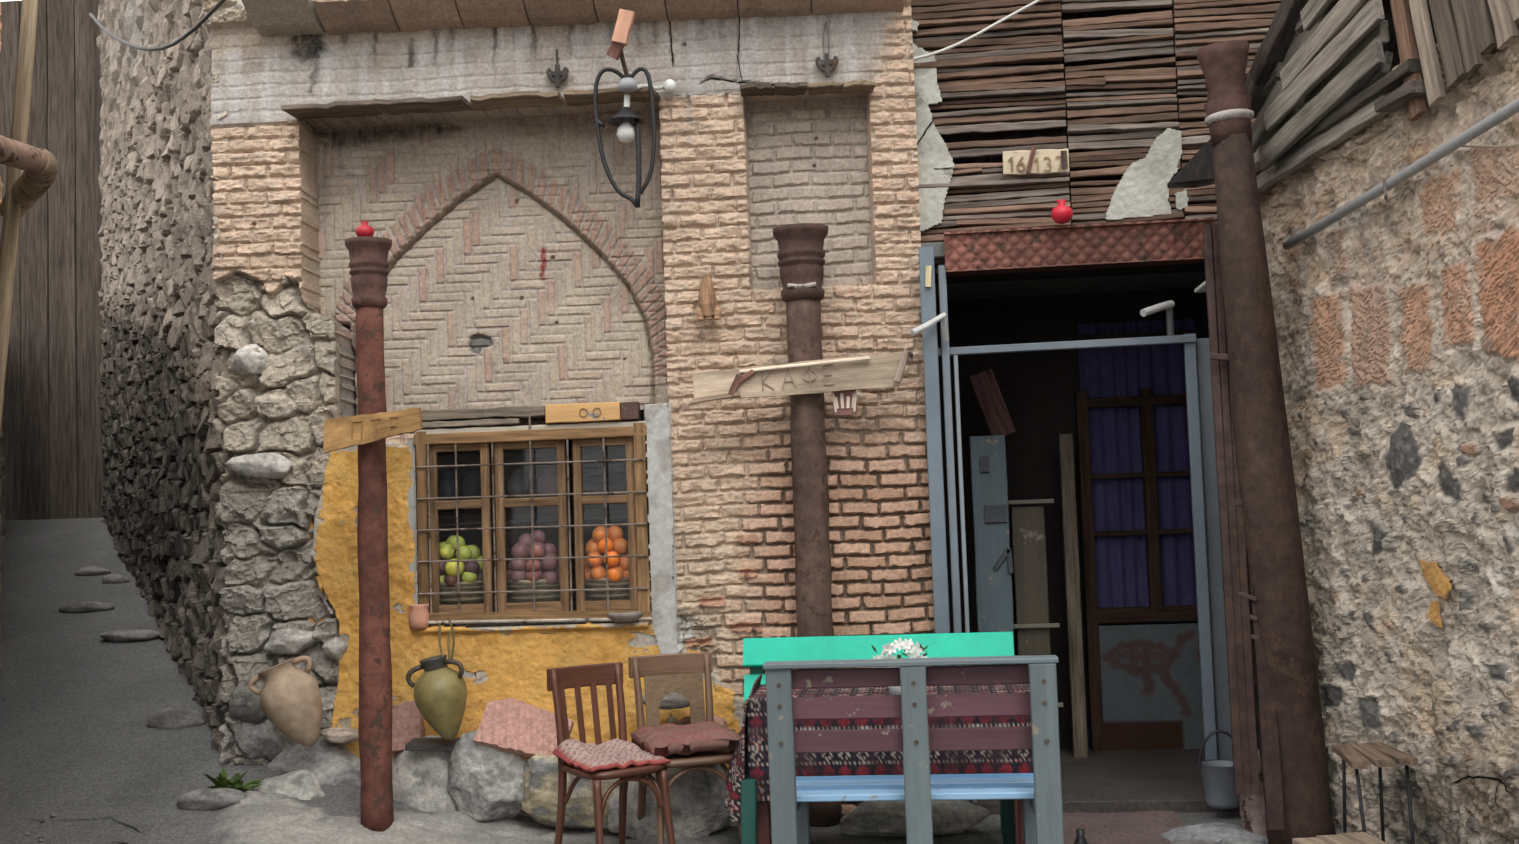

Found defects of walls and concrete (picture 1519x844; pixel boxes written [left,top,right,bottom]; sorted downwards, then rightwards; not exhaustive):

flaking render [911,18,954,232]
flaking render [1104,128,1189,220]
peeling [1420,559,1452,627]